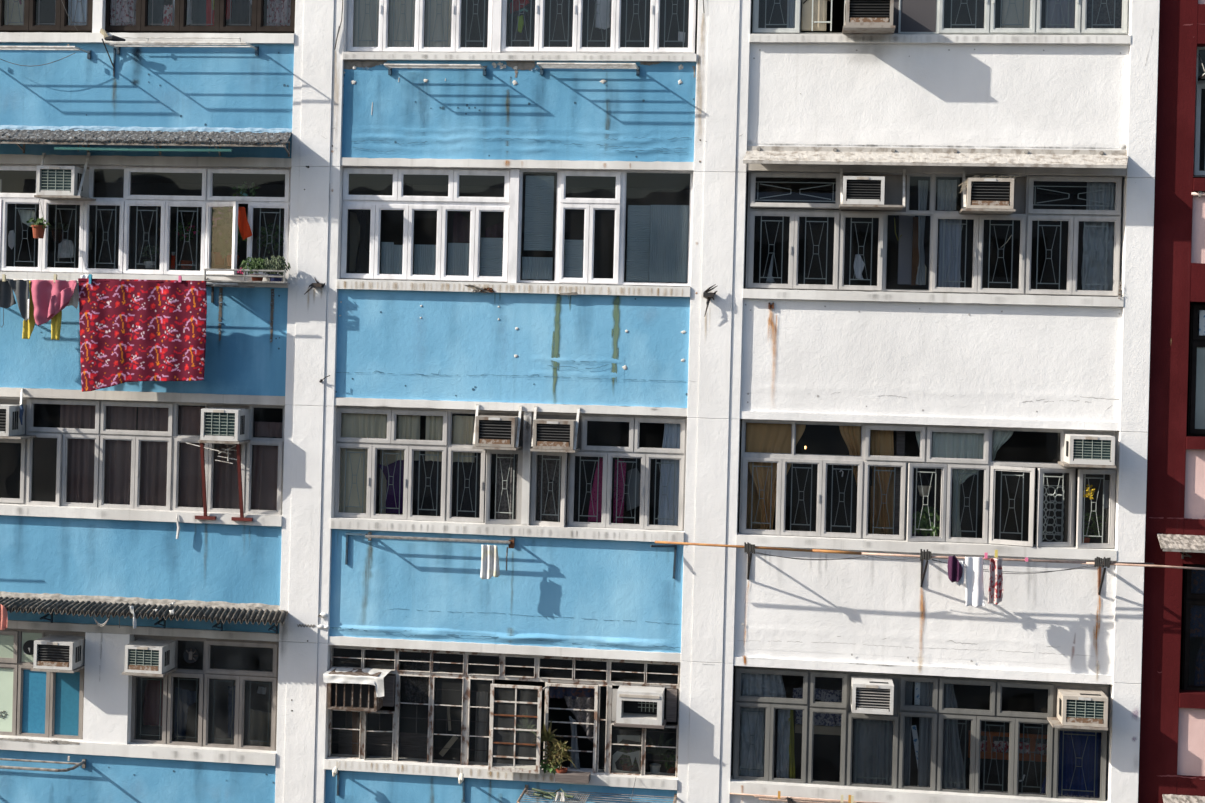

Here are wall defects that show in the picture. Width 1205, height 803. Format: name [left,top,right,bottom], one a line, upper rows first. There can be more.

damp [552,294,571,394]
damp [612,295,620,385]
rust [768,310,777,367]